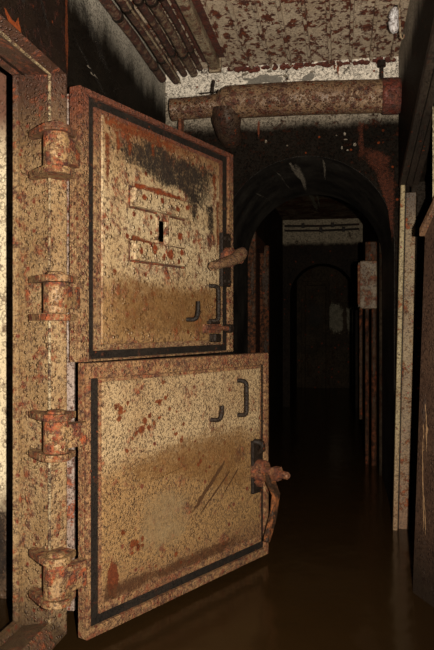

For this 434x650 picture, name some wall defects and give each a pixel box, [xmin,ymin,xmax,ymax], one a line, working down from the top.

rust [227,56,396,75]
rust [358,122,395,236]